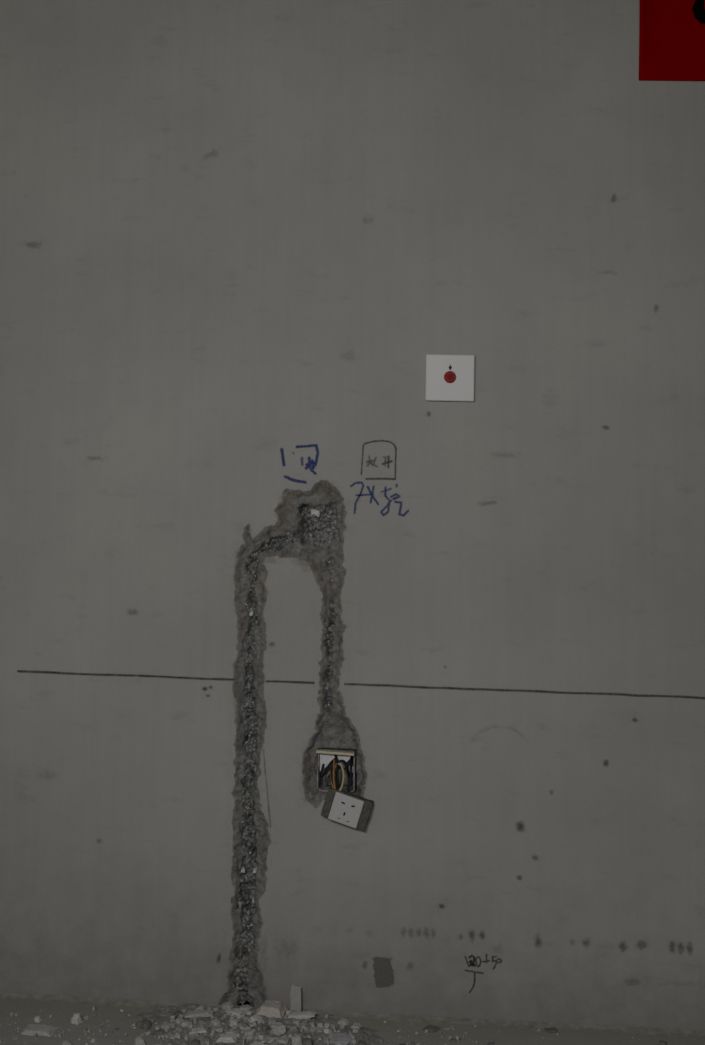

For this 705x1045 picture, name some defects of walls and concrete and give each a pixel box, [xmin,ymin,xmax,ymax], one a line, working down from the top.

spalling [218,480,367,1007]